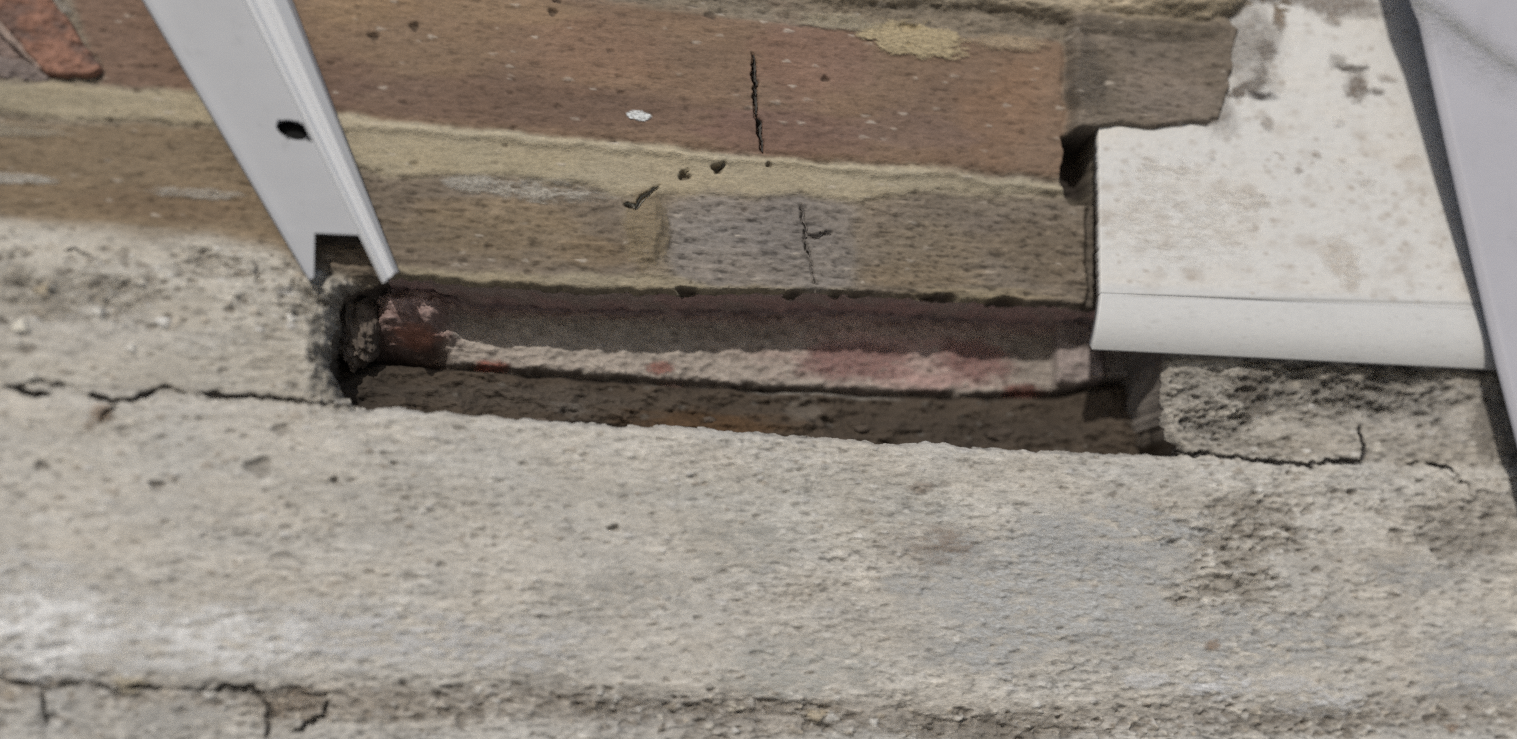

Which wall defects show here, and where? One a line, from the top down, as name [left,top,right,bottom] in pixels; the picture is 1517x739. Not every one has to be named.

crack [752,55,763,152]
crack [624,186,659,209]
crack [800,208,831,282]
spalling [291,278,1469,457]
crack [6,379,353,421]
crack [1170,425,1366,467]
crack [1406,460,1471,487]
crack [0,677,328,738]